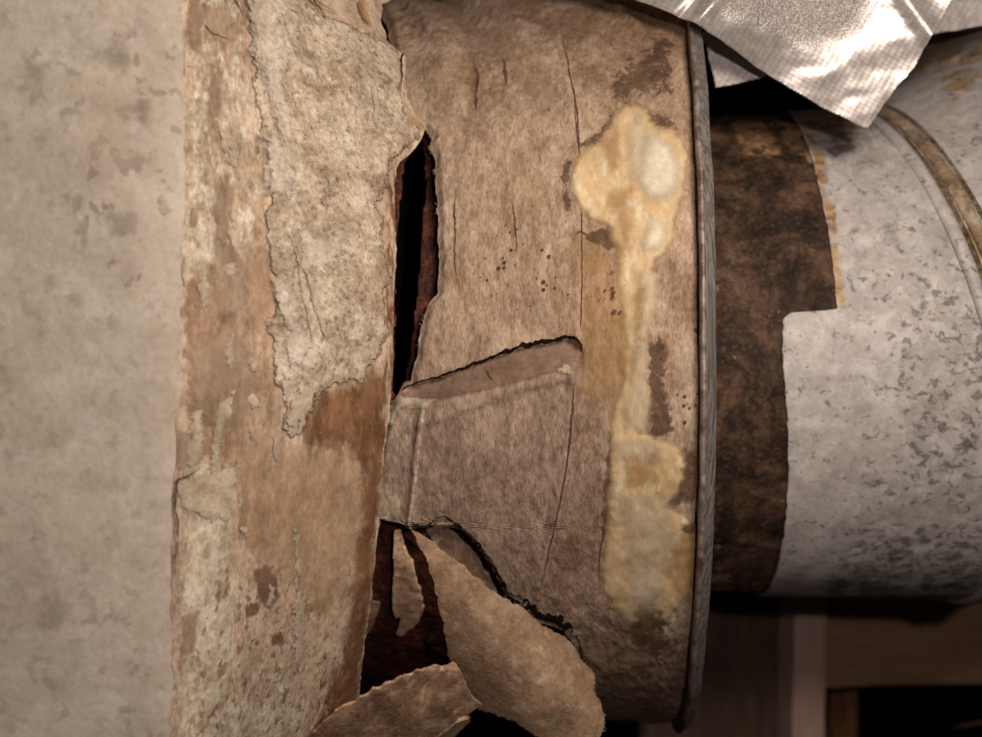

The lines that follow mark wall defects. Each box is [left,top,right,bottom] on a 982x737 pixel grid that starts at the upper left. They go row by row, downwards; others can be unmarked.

crack [563,41,580,153]
peeling [178,389,240,523]
peeling [222,222,241,277]
flaking render [247,0,421,461]
crack [402,207,588,665]
crack [599,430,611,589]
water stain [561,37,700,663]
peeling [409,527,606,737]